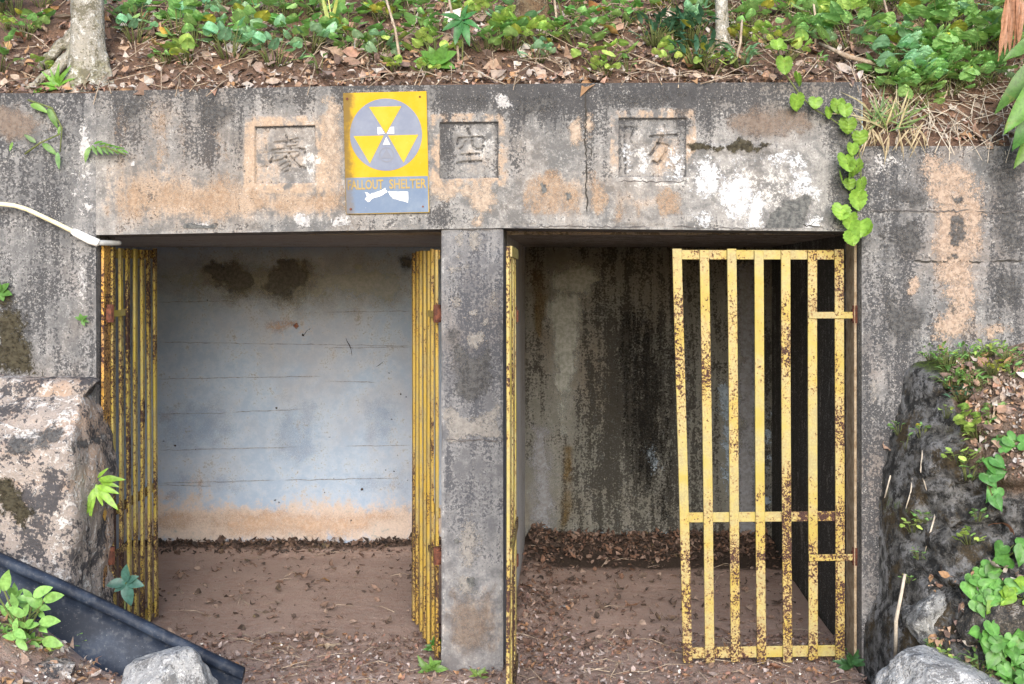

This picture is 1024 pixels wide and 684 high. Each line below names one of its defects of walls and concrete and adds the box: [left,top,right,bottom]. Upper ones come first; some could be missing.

crack [464,92,767,230]
water stain [163,256,412,301]
crack [448,436,502,444]
water stain [529,261,601,529]
water stain [615,301,678,522]